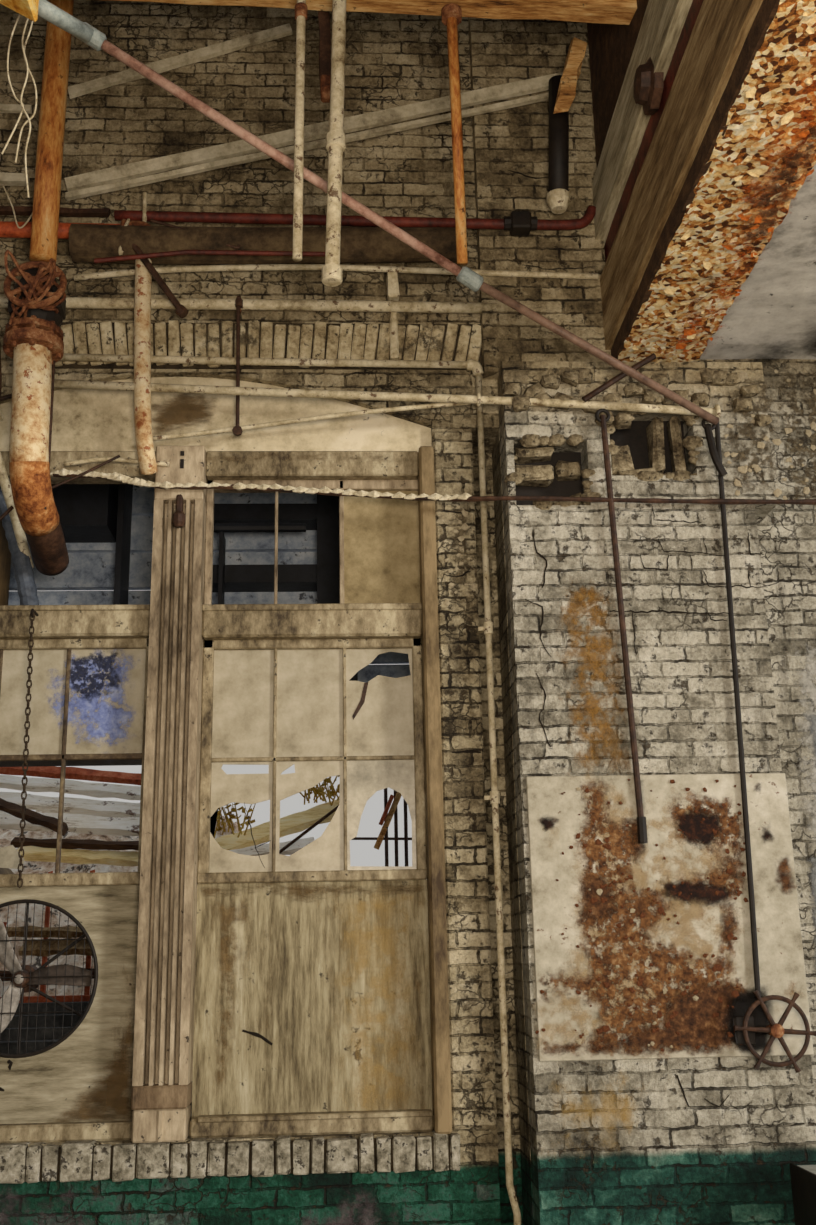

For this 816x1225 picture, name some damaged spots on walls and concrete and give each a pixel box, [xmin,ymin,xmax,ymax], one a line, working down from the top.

peeling [782,11,814,34]
spalling [502,110,816,510]
corrosion [536,780,749,1056]